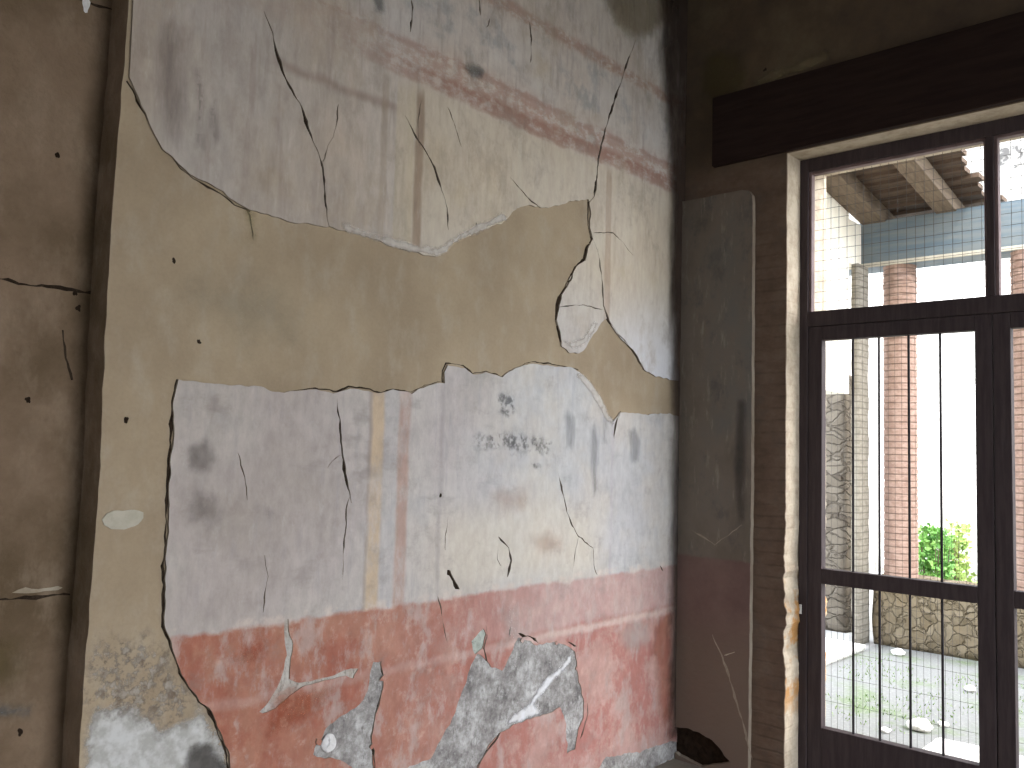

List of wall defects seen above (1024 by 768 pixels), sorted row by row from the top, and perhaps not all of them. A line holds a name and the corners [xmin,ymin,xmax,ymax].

crack [274,46,311,136]
crack [2,278,91,294]
peeling [345,214,506,255]
crack [294,57,643,547]
water stain [86,643,226,768]
spalling [260,619,357,713]
spalling [313,662,389,768]
spalling [408,630,583,768]